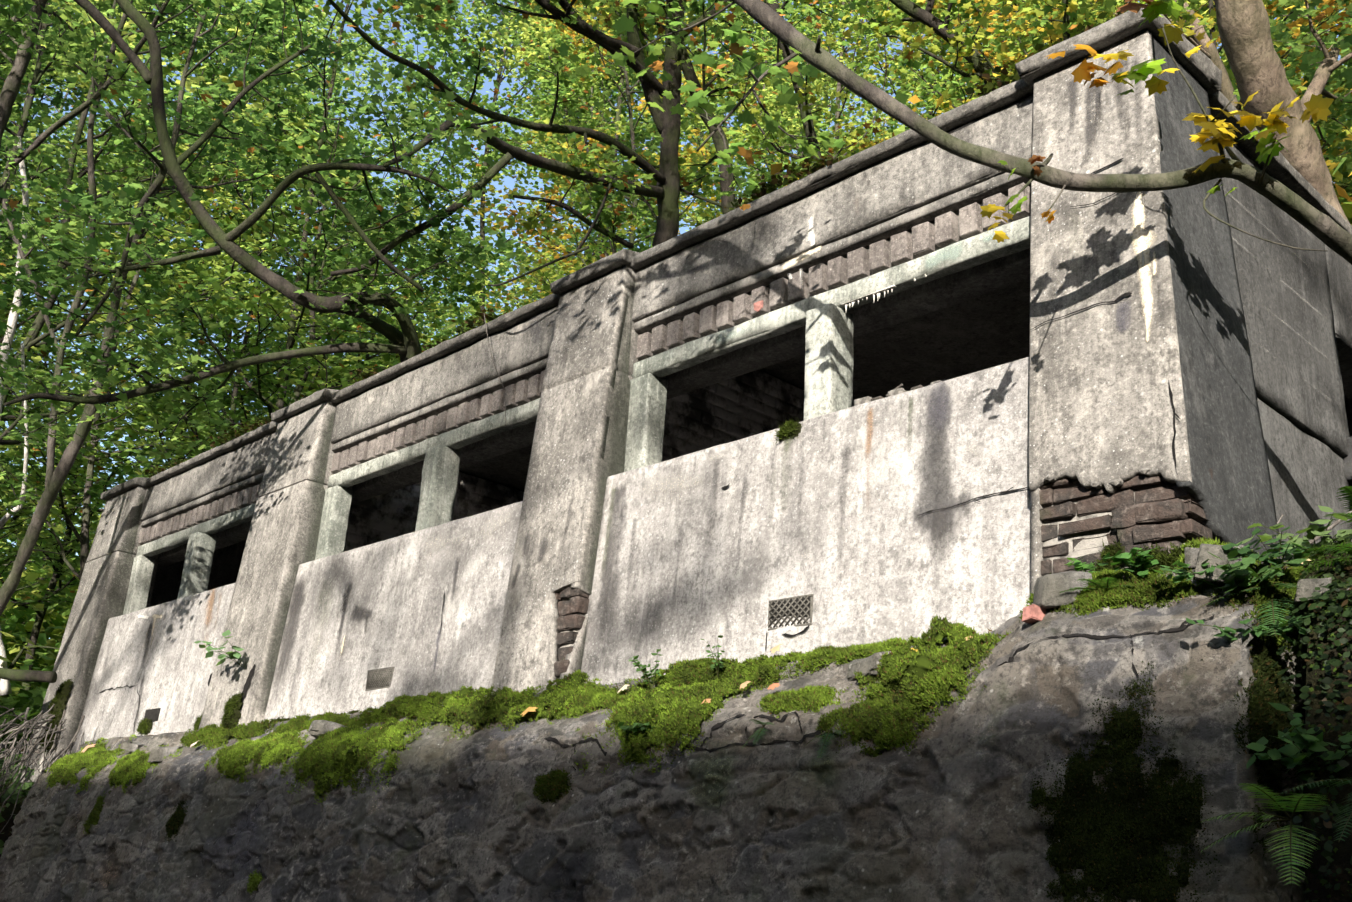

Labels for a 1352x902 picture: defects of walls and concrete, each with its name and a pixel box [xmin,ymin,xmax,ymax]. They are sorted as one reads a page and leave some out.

water stain [1133,192,1156,342]
water stain [917,412,965,548]
spalling [1039,468,1216,577]
crack [1168,380,1180,475]
spalling [554,585,589,679]